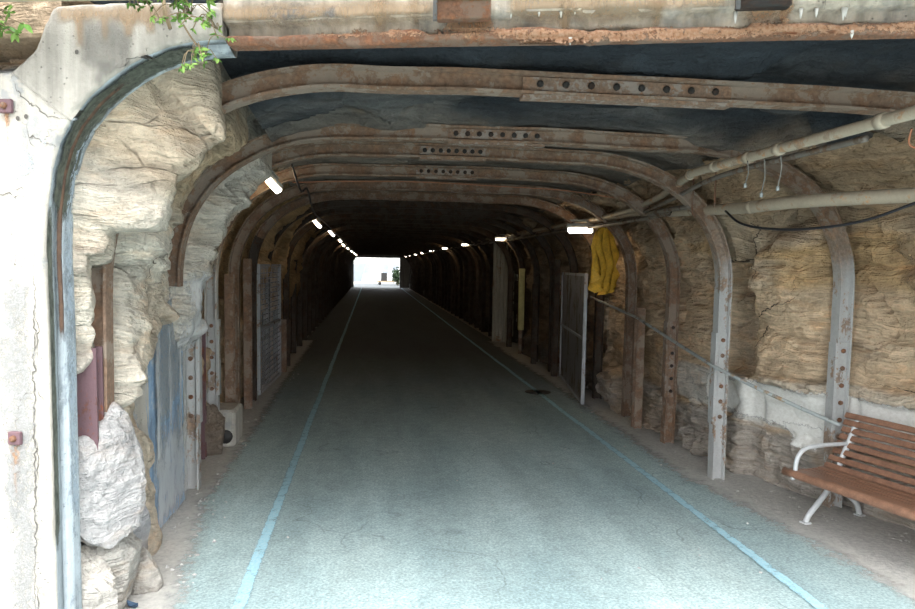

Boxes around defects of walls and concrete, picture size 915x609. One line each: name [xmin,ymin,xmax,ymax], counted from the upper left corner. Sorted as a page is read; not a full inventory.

crack [15,249,44,609]